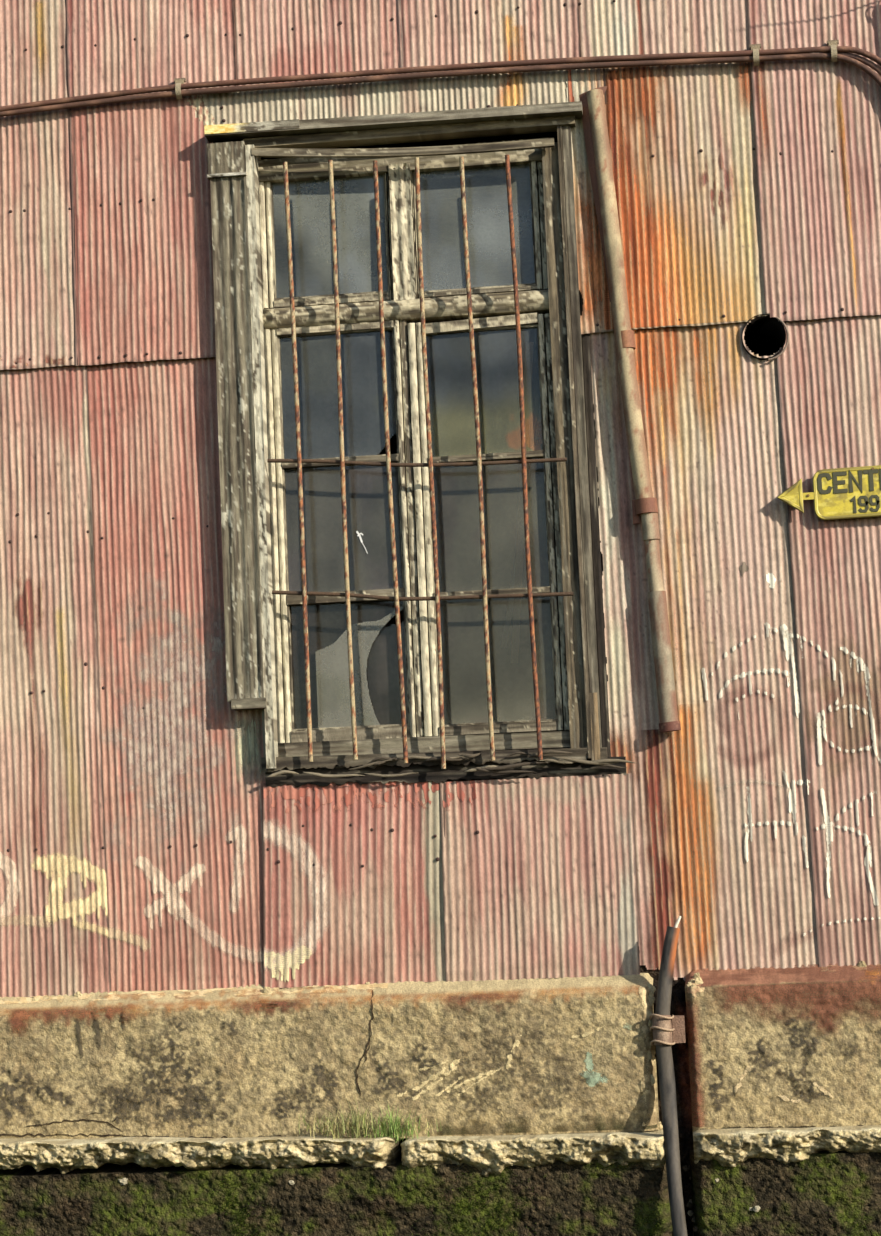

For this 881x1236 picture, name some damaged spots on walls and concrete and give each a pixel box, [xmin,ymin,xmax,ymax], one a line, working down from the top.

corrosion [739,62,768,145]
corrosion [582,0,744,522]
corrosion [610,705,715,970]
leakage [0,1066,79,1123]
corrosion [7,1006,140,1031]
leakage [75,1019,102,1058]
leakage [89,1017,238,1130]
corrosion [166,1000,303,1014]
leakage [263,1064,338,1119]
crack [356,990,377,1097]
leakage [707,1060,735,1111]
leakage [748,1015,857,1103]